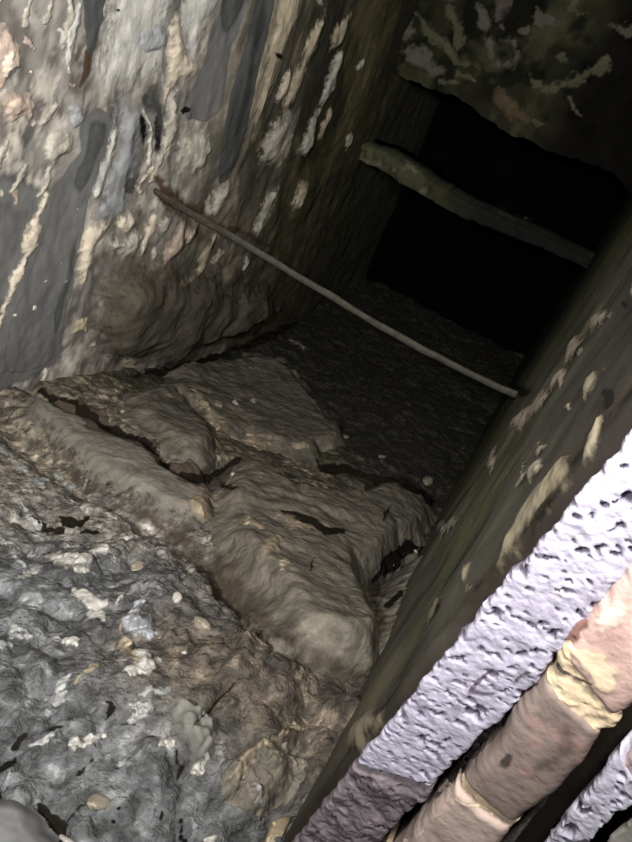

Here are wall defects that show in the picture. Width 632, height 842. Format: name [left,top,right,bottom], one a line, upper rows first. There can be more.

damp [79,0,108,87]
damp [184,0,274,184]
damp [143,109,153,166]
rust [154,176,204,215]
damp [302,131,327,221]
damp [0,108,113,390]
damp [190,388,231,446]
damp [242,433,274,451]
damp [292,441,310,449]
damp [565,377,632,470]